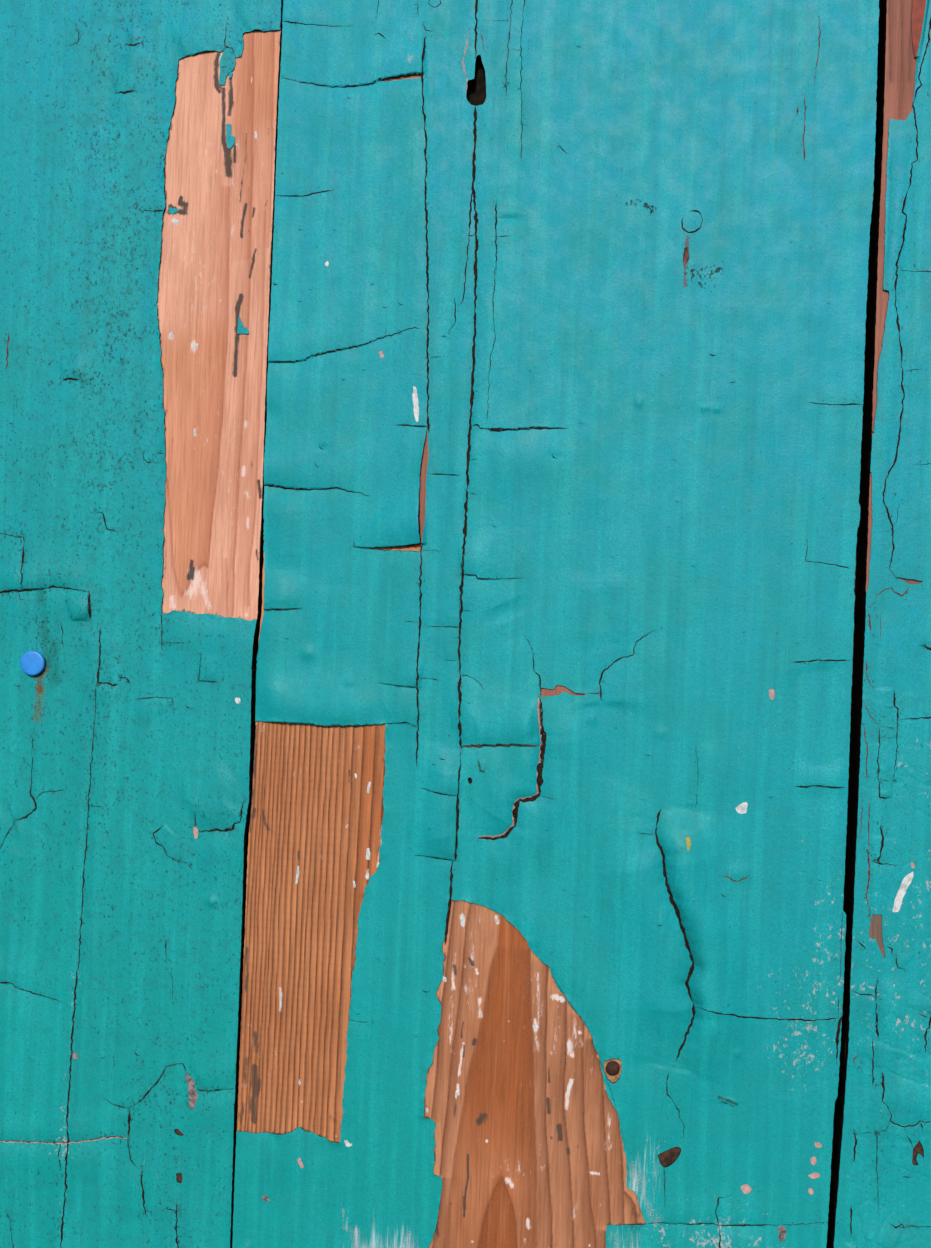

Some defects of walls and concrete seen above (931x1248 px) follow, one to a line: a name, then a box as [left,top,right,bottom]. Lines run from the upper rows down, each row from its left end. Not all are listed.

crack [0,533,229,1248]
crack [195,802,244,832]
peeling [157,30,429,1147]
crack [264,0,568,943]
peeling [424,900,646,1248]
crack [599,630,656,699]
crack [639,14,931,1248]
peeling [863,0,930,593]